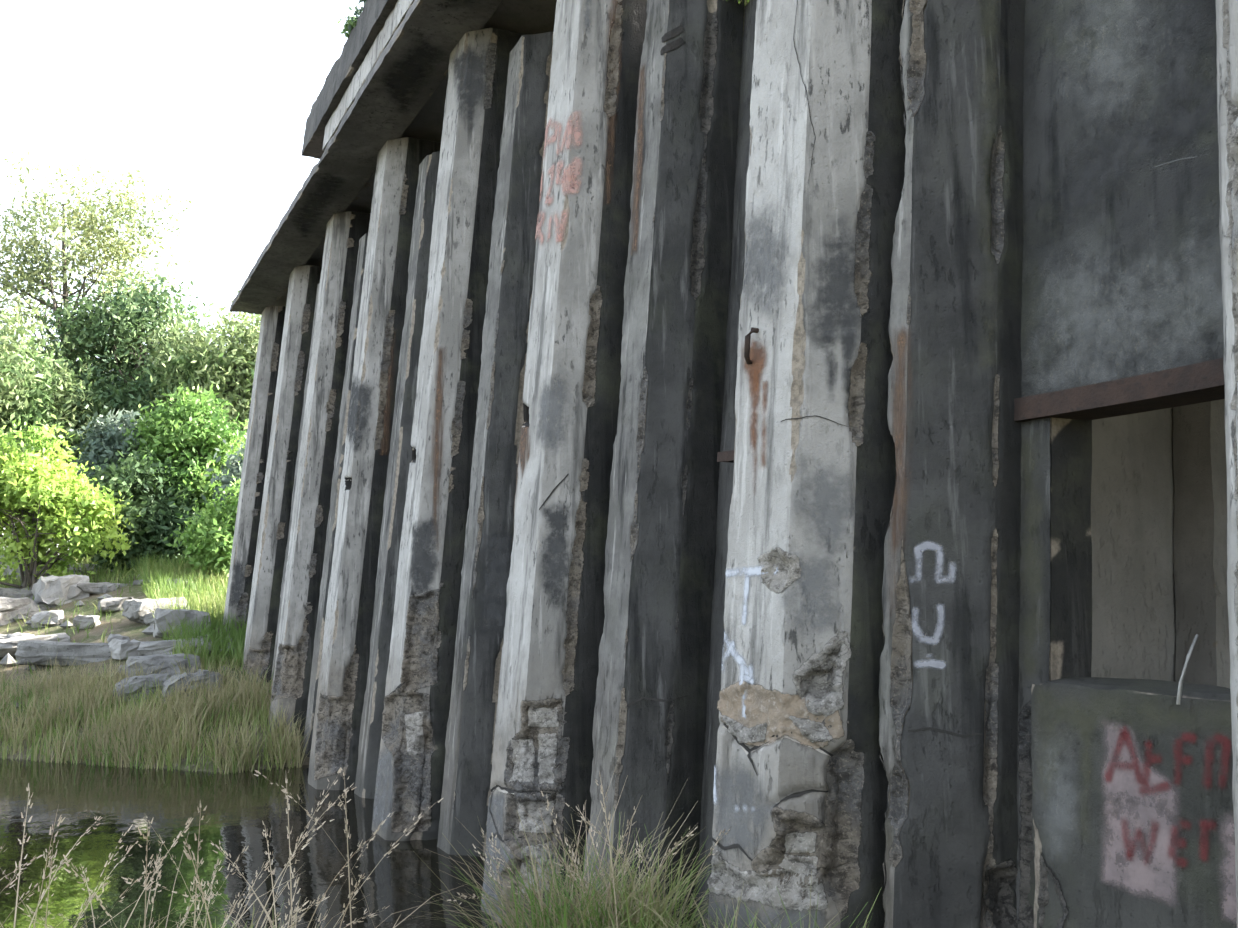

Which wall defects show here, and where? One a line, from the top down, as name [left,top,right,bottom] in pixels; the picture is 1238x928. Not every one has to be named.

crack [793,0,816,184]
spalling [374,310,395,450]
spalling [582,284,603,408]
rust [744,342,767,465]
damp [745,219,783,302]
damp [811,236,861,407]
spalling [855,130,876,315]
spalling [1222,0,1238,544]
spalling [757,547,802,593]
spalling [382,581,445,833]
spalling [501,458,590,912]
spalling [707,631,865,919]